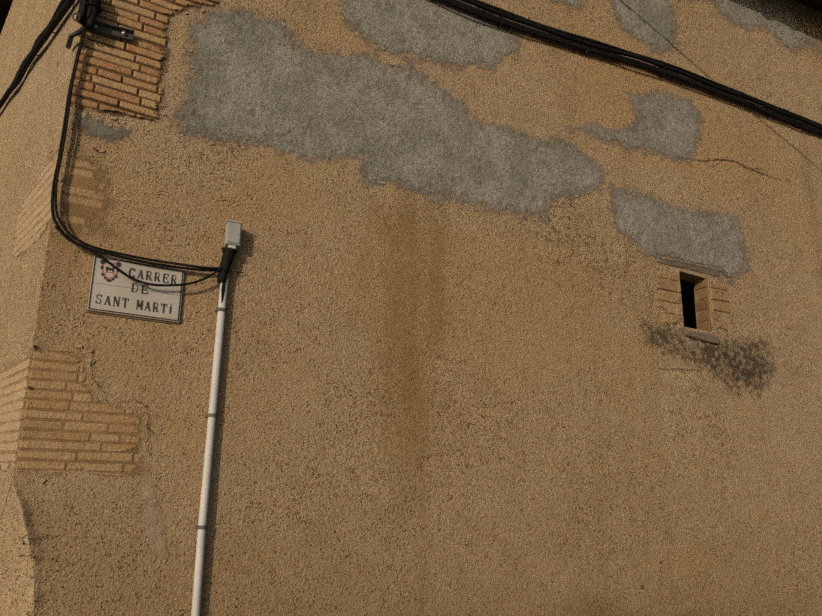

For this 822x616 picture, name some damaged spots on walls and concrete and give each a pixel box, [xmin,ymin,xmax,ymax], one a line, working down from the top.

flaking render [705,0,814,52]
flaking render [12,0,751,283]
spalling [0,343,142,484]